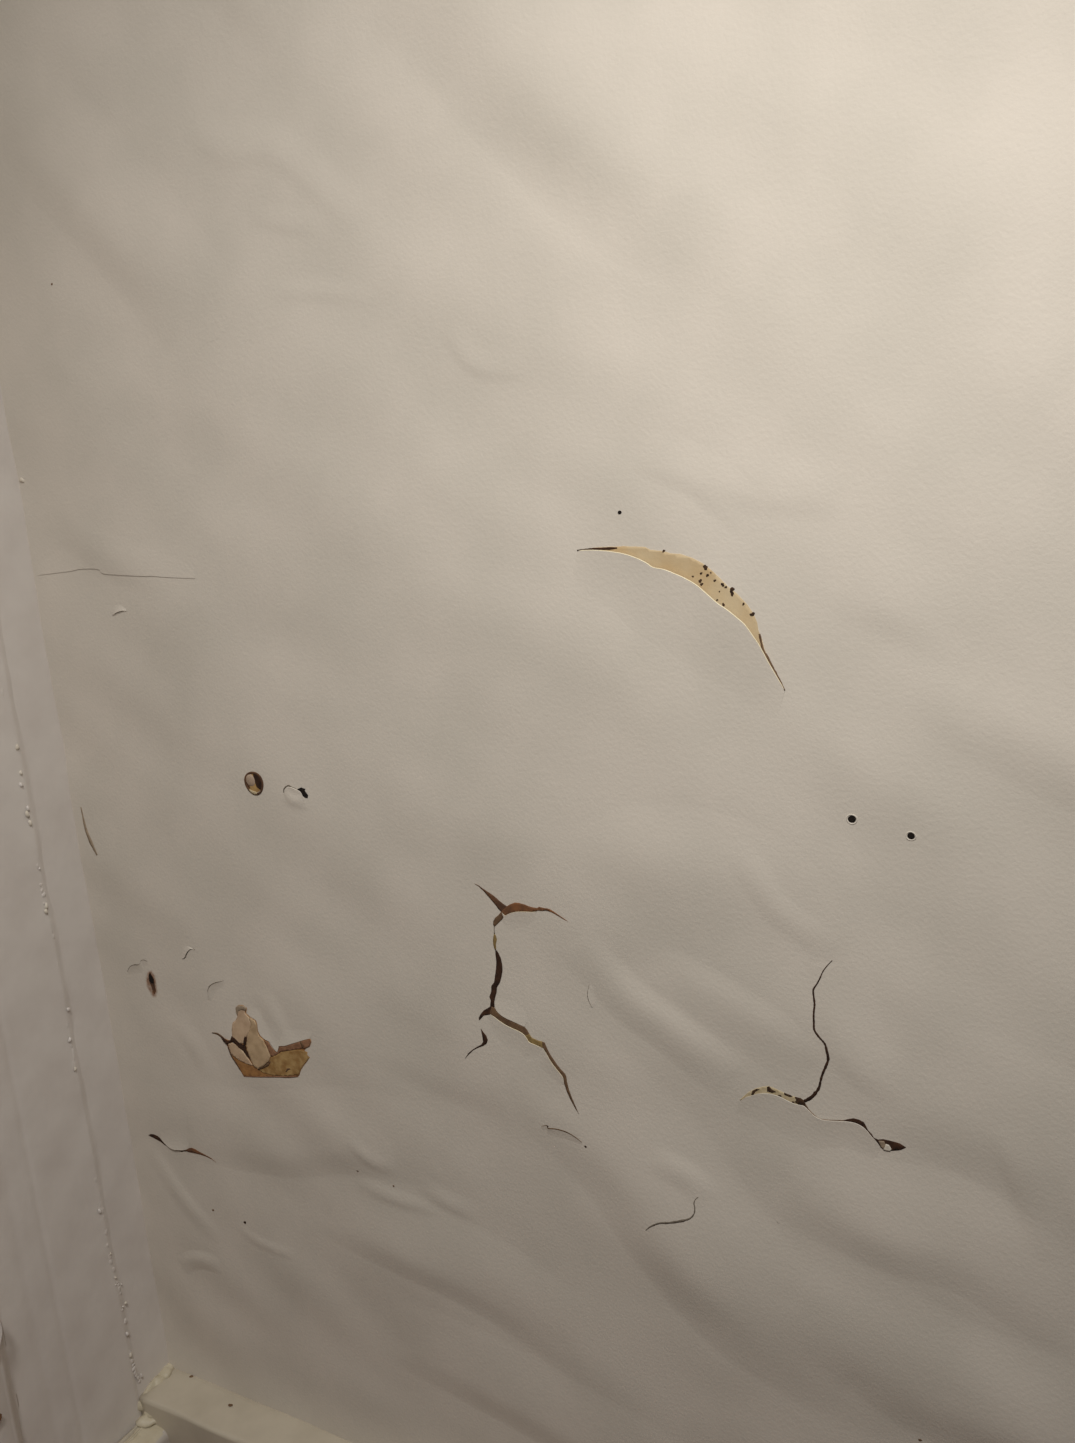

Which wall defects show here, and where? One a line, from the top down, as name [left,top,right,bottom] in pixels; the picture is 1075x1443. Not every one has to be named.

peeling [573,546,785,717]
crack [149,1127,214,1161]
peeling [212,1005,312,1078]
crack [466,884,587,1148]
crack [646,1197,698,1230]
crack [736,961,906,1158]